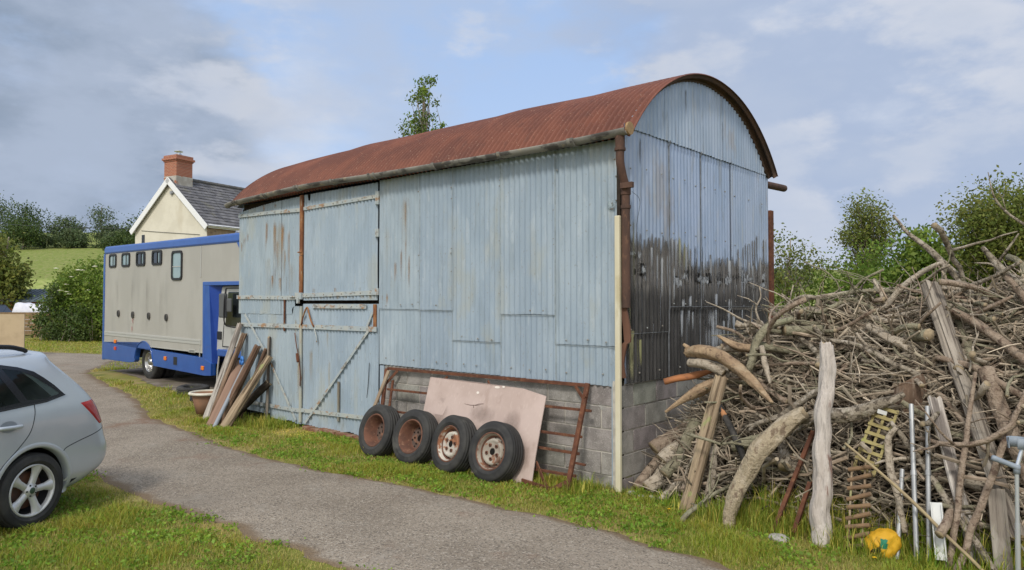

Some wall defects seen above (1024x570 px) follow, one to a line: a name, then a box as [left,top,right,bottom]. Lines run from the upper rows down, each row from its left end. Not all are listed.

damp [626,235,769,384]